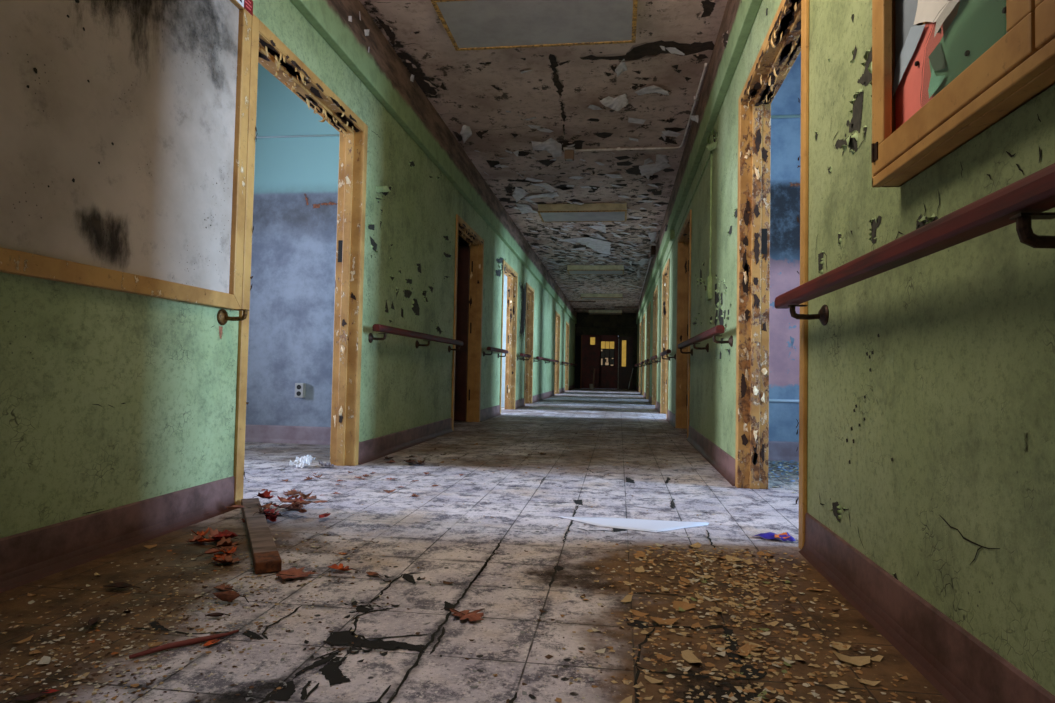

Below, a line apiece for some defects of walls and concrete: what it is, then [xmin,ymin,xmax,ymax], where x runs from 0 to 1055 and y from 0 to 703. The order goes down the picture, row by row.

leakage [104,0,167,47]
leakage [192,0,230,81]
peeling [258,38,379,140]
peeling [741,0,801,108]
peeling [815,45,872,155]
peeling [453,31,729,294]
leakage [80,211,129,262]
peeling [727,199,767,320]
crack [549,505,578,587]
crack [940,516,1000,563]
crack [375,540,501,703]
leakage [190,678,298,703]